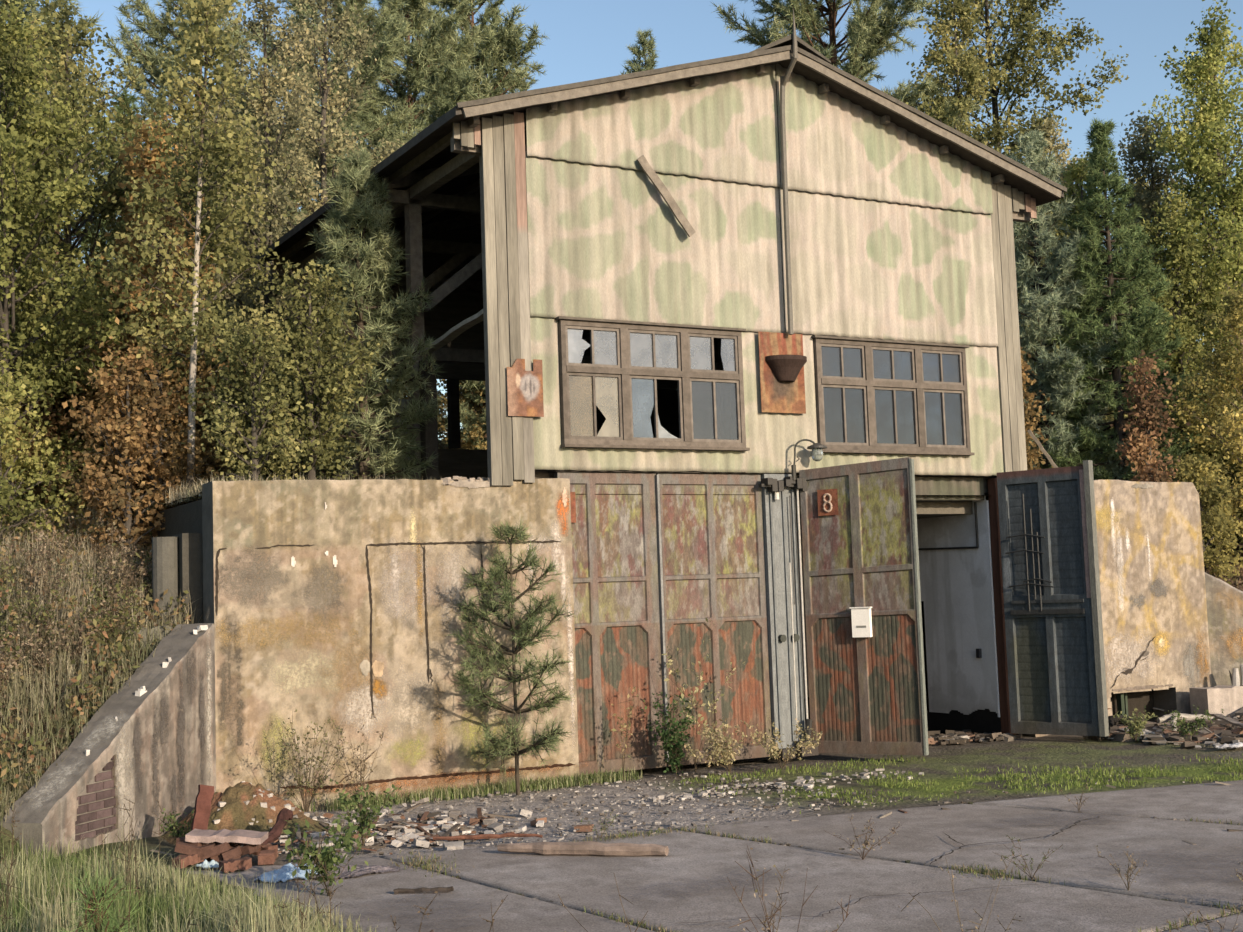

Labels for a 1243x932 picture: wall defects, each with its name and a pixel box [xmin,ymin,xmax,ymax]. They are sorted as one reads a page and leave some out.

damp [218,550,287,604]
damp [133,567,387,816]
damp [410,515,423,622]
damp [528,524,575,723]
crack [1108,636,1156,709]
damp [1098,501,1167,608]
spalling [75,730,131,840]